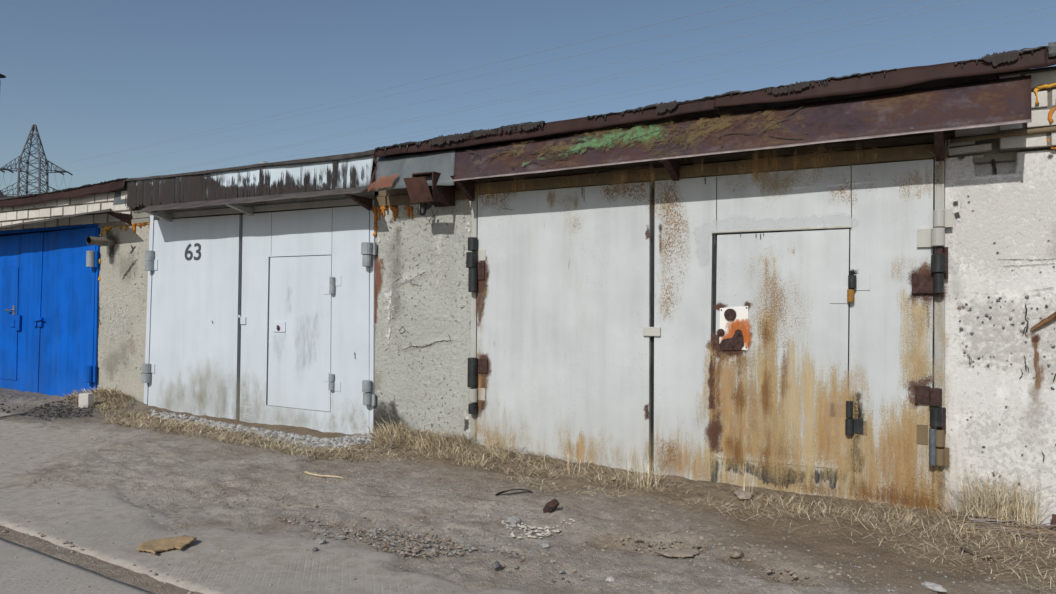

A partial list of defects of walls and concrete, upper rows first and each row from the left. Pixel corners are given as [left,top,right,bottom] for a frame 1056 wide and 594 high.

corrosion [602,181,688,254]
corrosion [476,258,489,325]
corrosion [476,354,491,414]
corrosion [646,259,950,512]
corrosion [1027,333,1044,397]